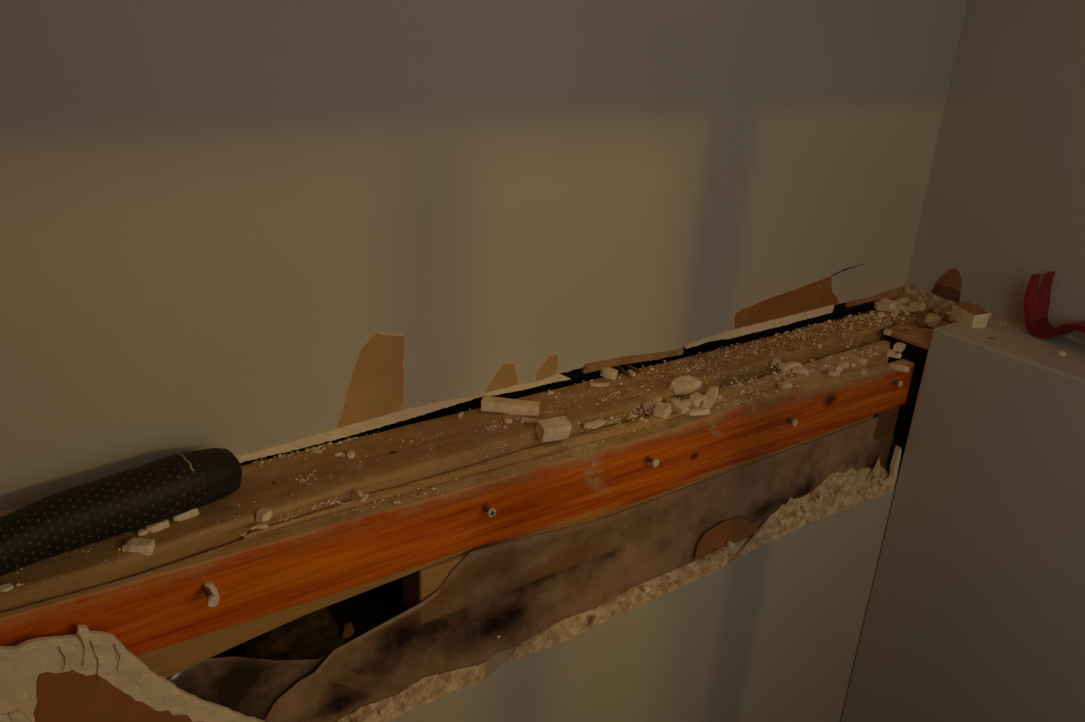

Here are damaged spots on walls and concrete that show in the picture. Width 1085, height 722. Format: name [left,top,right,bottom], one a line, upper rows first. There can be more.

spalling [582,283,956,387]
spalling [235,373,570,463]
spalling [337,445,902,722]
spalling [0,625,265,722]